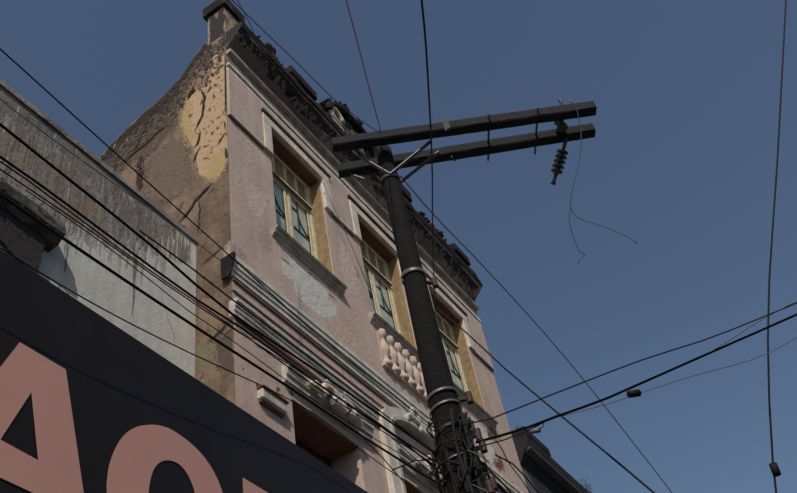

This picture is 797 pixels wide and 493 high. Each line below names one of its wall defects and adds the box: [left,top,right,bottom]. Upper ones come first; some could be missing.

damp [0,7,361,285]
peeling [173,53,228,185]
crack [193,56,226,162]
peeling [278,255,340,322]
damp [407,208,479,300]